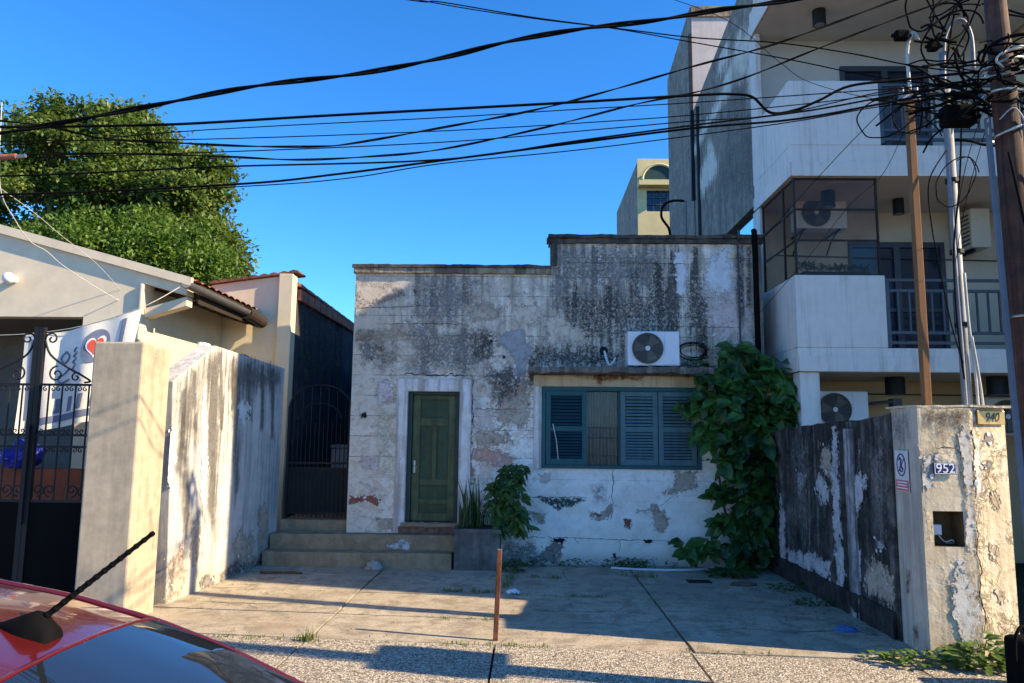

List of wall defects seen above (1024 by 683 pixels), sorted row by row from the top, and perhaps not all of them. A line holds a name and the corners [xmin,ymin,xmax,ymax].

leakage [296,244,736,403]
leakage [177,352,280,529]
leakage [220,559,262,581]
peeling [349,495,411,550]
peeling [528,472,613,525]
peeling [623,470,702,545]
peeling [779,426,847,587]
peeling [854,471,868,519]
peeling [859,536,901,609]
peeling [918,408,939,545]
peeling [938,420,1002,656]
flaking render [994,588,1007,605]